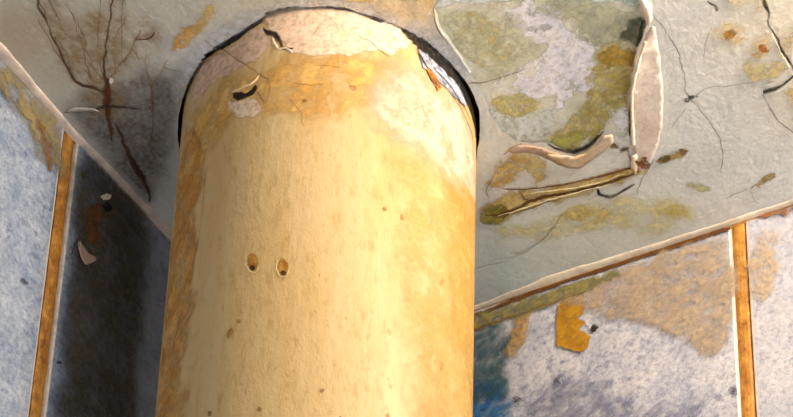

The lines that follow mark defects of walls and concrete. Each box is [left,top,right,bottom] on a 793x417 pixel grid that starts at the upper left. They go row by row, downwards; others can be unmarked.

crack [37,0,168,202]
peeling [193,6,410,103]
peeling [417,50,475,139]
peeling [433,0,663,194]
crack [652,0,793,169]
peeling [78,241,96,265]
corrosion [556,293,598,352]
water stain [560,241,739,354]